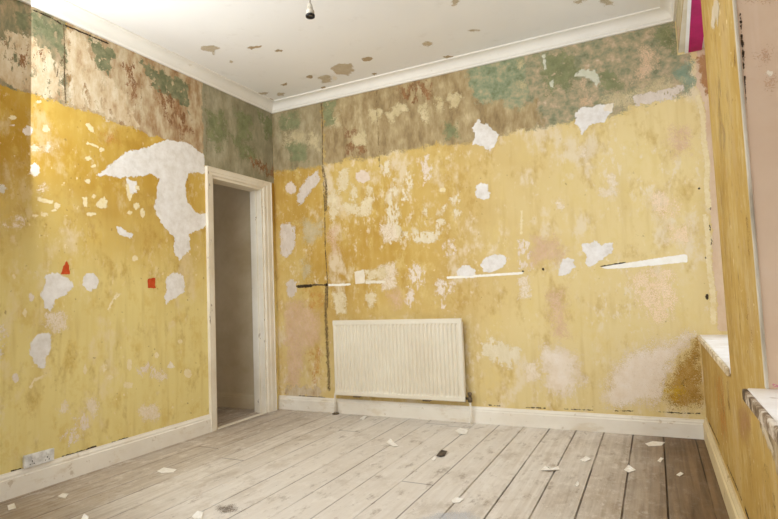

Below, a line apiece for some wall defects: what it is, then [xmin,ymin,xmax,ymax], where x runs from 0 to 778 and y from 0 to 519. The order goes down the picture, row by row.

water stain [480,284,704,416]
peeling [716,375,778,482]